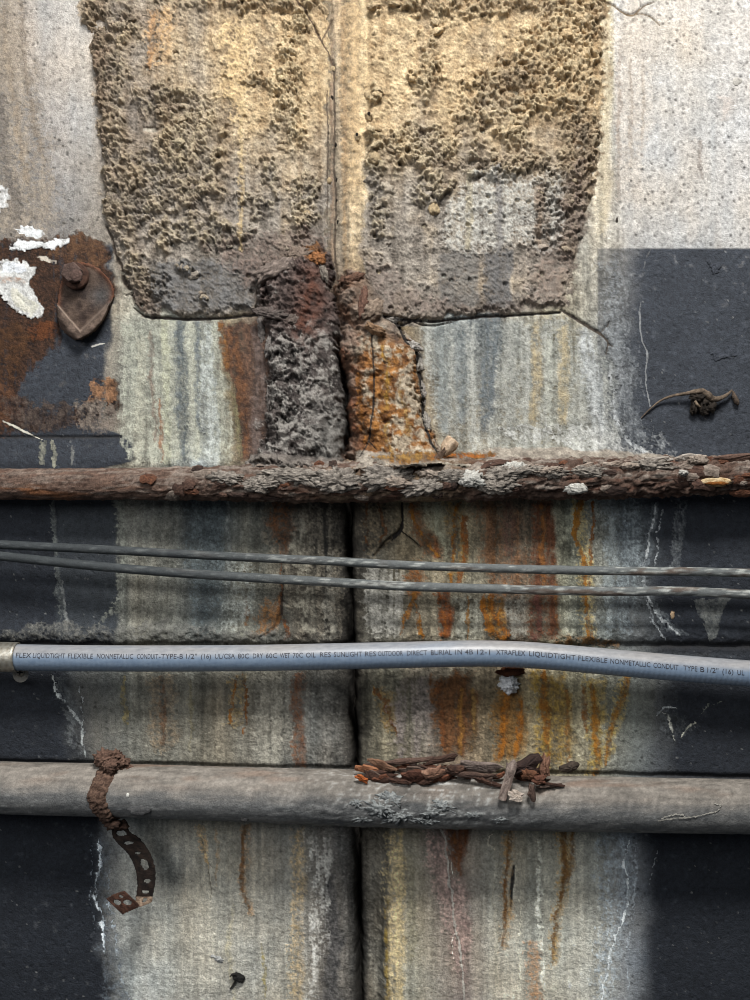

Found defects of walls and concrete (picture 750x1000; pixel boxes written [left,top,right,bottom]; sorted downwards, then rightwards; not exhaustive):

flaking render [75,0,339,323]
crack [296,0,339,285]
flaking render [356,0,614,328]
rust [0,226,123,439]
damp [116,312,237,467]
rust [217,319,267,463]
crack [392,502,420,546]
rust [368,450,500,466]
rust [399,497,620,650]
rust [428,667,632,802]
rust [447,829,472,876]
rust [495,830,577,1000]